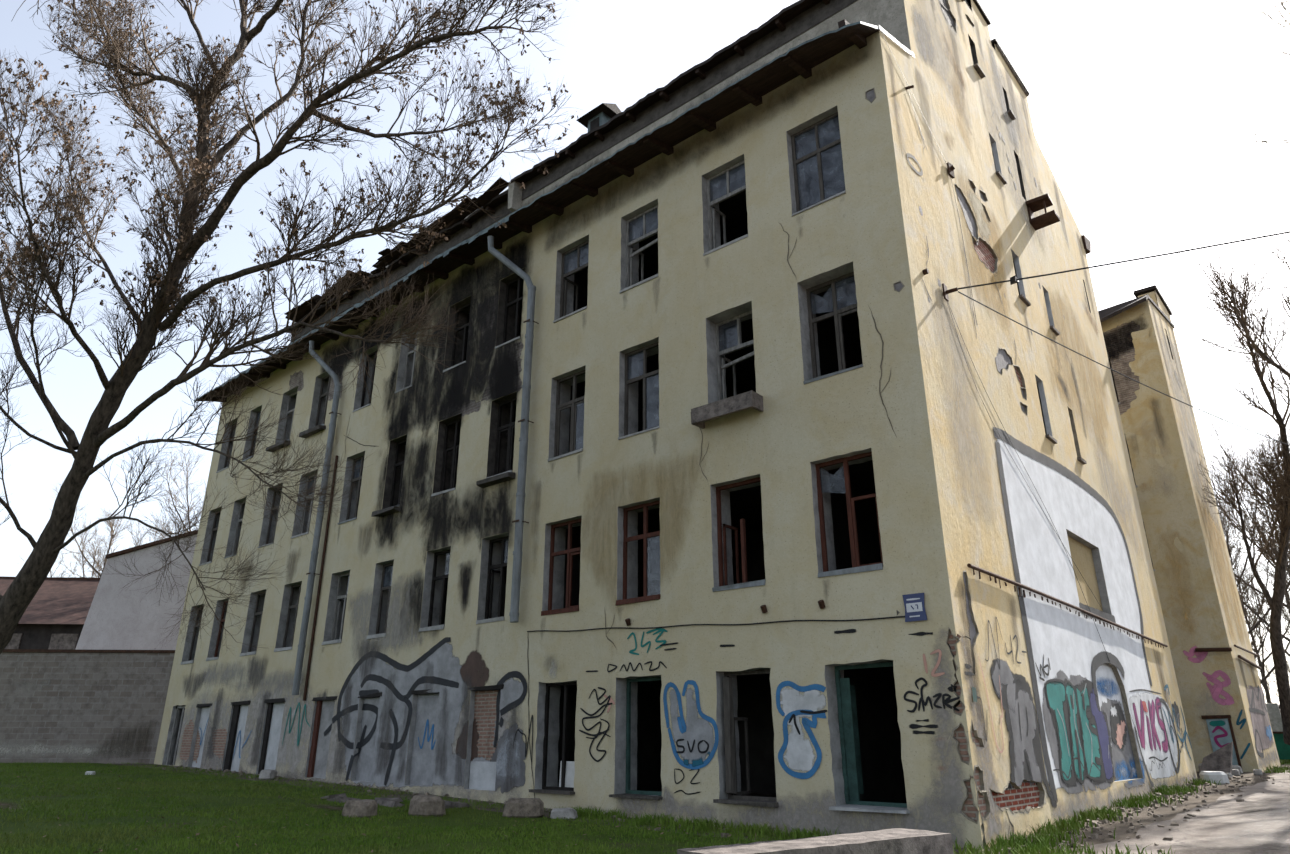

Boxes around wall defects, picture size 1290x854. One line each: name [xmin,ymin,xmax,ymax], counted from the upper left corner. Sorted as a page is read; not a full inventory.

leakage [914,0,962,104]
flaking render [938,0,974,34]
leakage [987,50,1040,225]
crack [781,225,797,276]
flaking render [954,179,999,274]
crack [870,309,897,437]
flaking render [995,347,1028,415]
flaking render [1103,321,1150,415]
peeling [176,682,373,788]
flaking render [451,703,512,763]
peeling [729,570,1196,849]